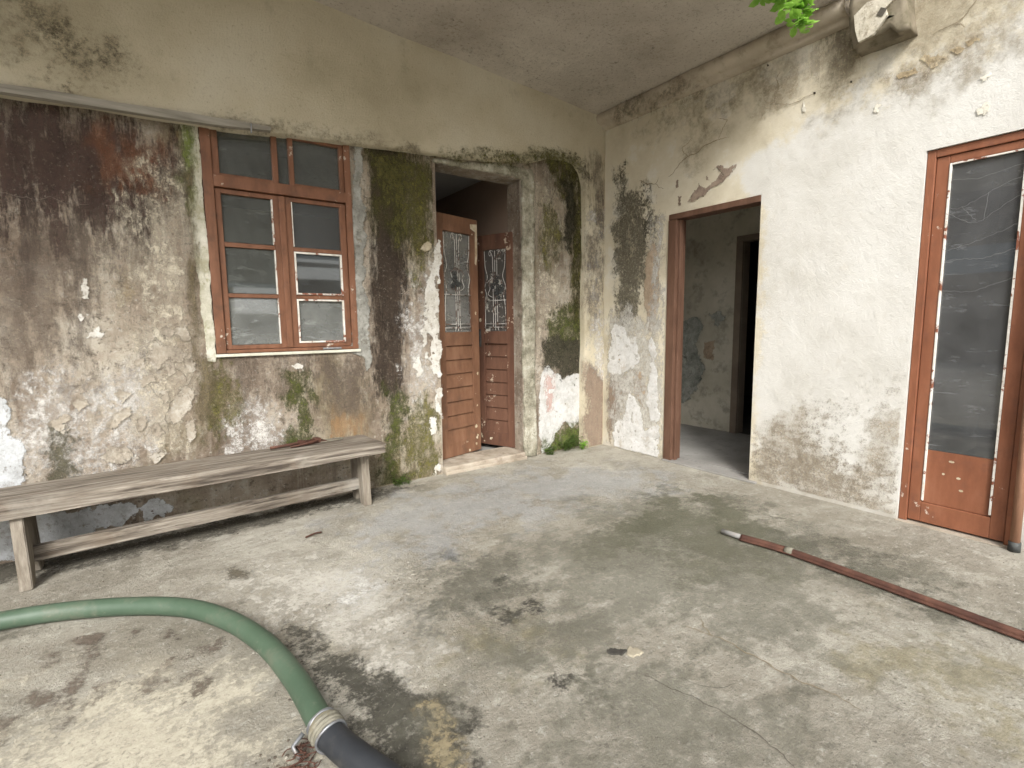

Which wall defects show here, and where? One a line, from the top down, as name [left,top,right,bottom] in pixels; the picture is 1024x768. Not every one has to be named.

flaking render [0,397,27,488]
water stain [0,101,256,481]
water stain [266,143,436,421]
peeling [413,239,443,437]
water stain [445,146,665,458]
flaking render [539,366,579,453]
peeling [607,241,660,457]
peeling [681,311,725,403]
peeling [676,164,737,206]
water stain [751,414,900,507]